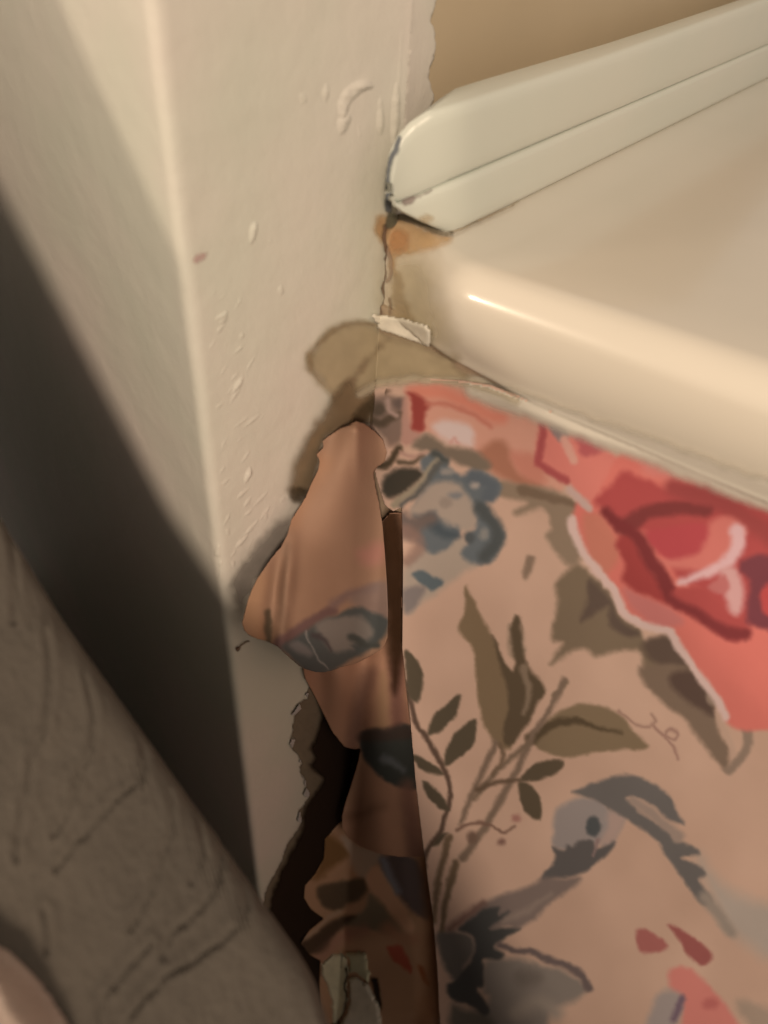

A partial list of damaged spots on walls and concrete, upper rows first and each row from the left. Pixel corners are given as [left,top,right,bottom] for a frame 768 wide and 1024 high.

crack [380,136,518,314]
water stain [290,323,474,502]
peeling [371,314,431,347]
spalling [264,687,360,992]